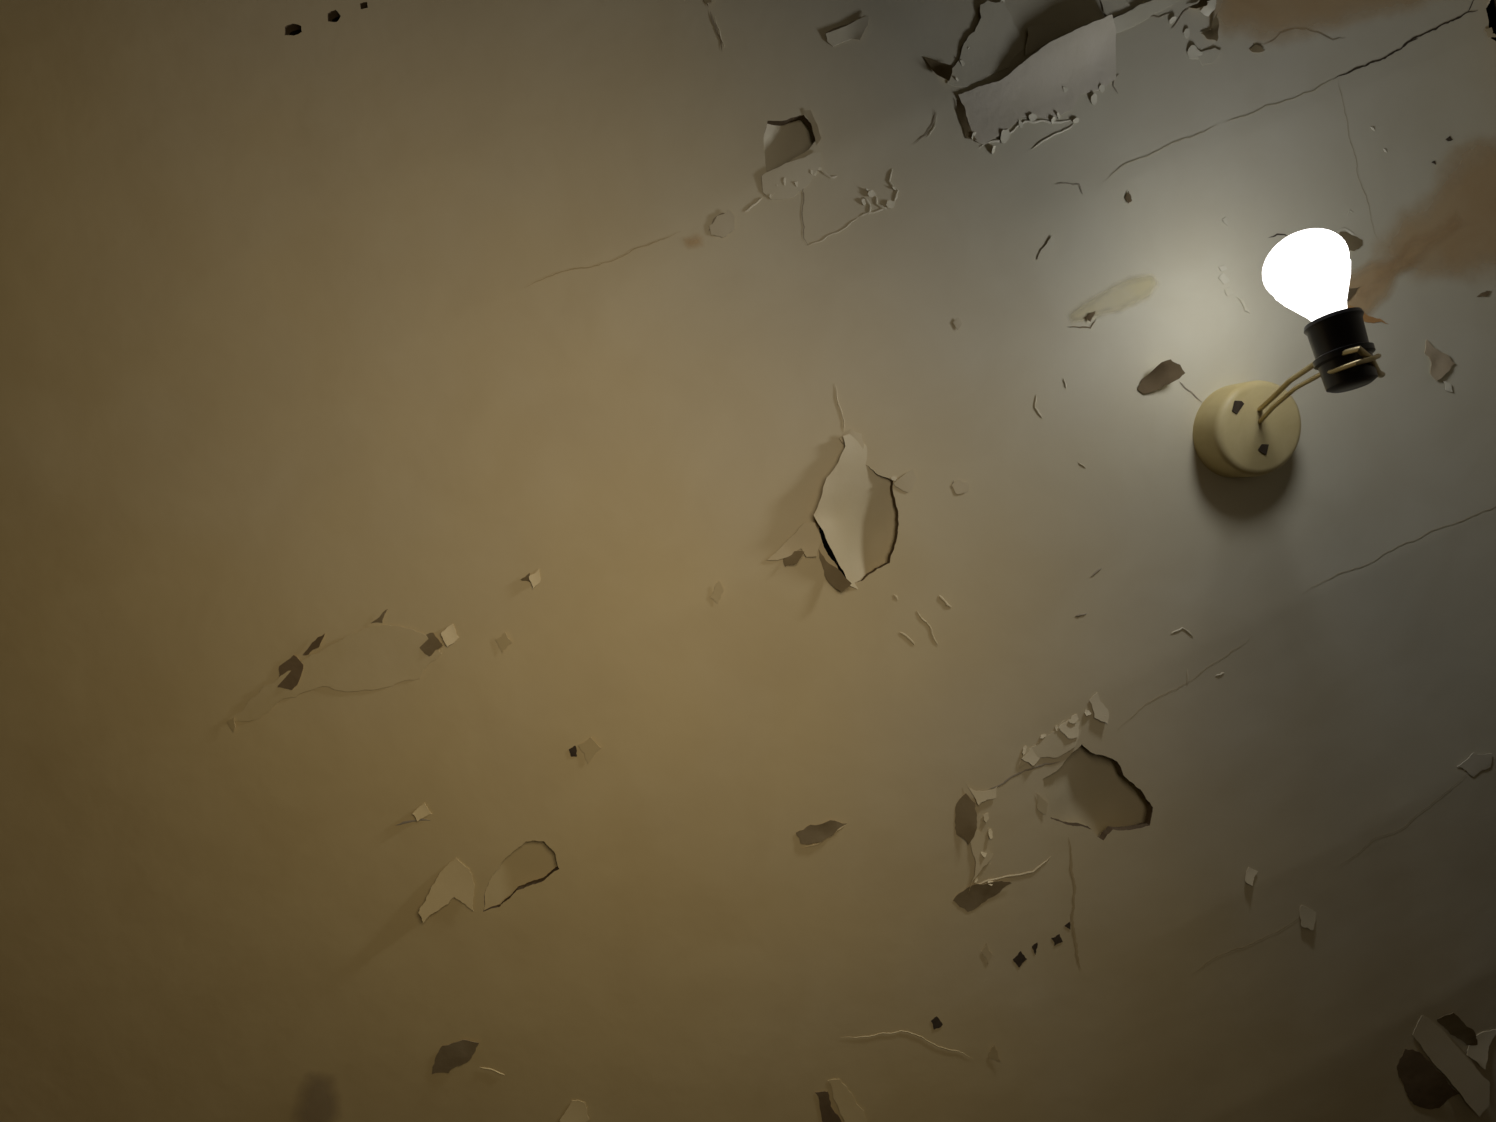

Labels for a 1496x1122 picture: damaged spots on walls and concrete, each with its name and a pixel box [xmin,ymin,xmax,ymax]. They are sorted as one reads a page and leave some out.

spalling [744,110,838,212]
peeling [924,0,1222,154]
crack [1055,0,1478,237]
water stain [1312,150,1496,313]
spalling [1486,0,1496,41]
peeling [768,385,917,592]
spalling [954,692,1148,912]
peeling [418,841,558,923]
peeling [815,1079,867,1122]
peeling [1397,1013,1496,1117]